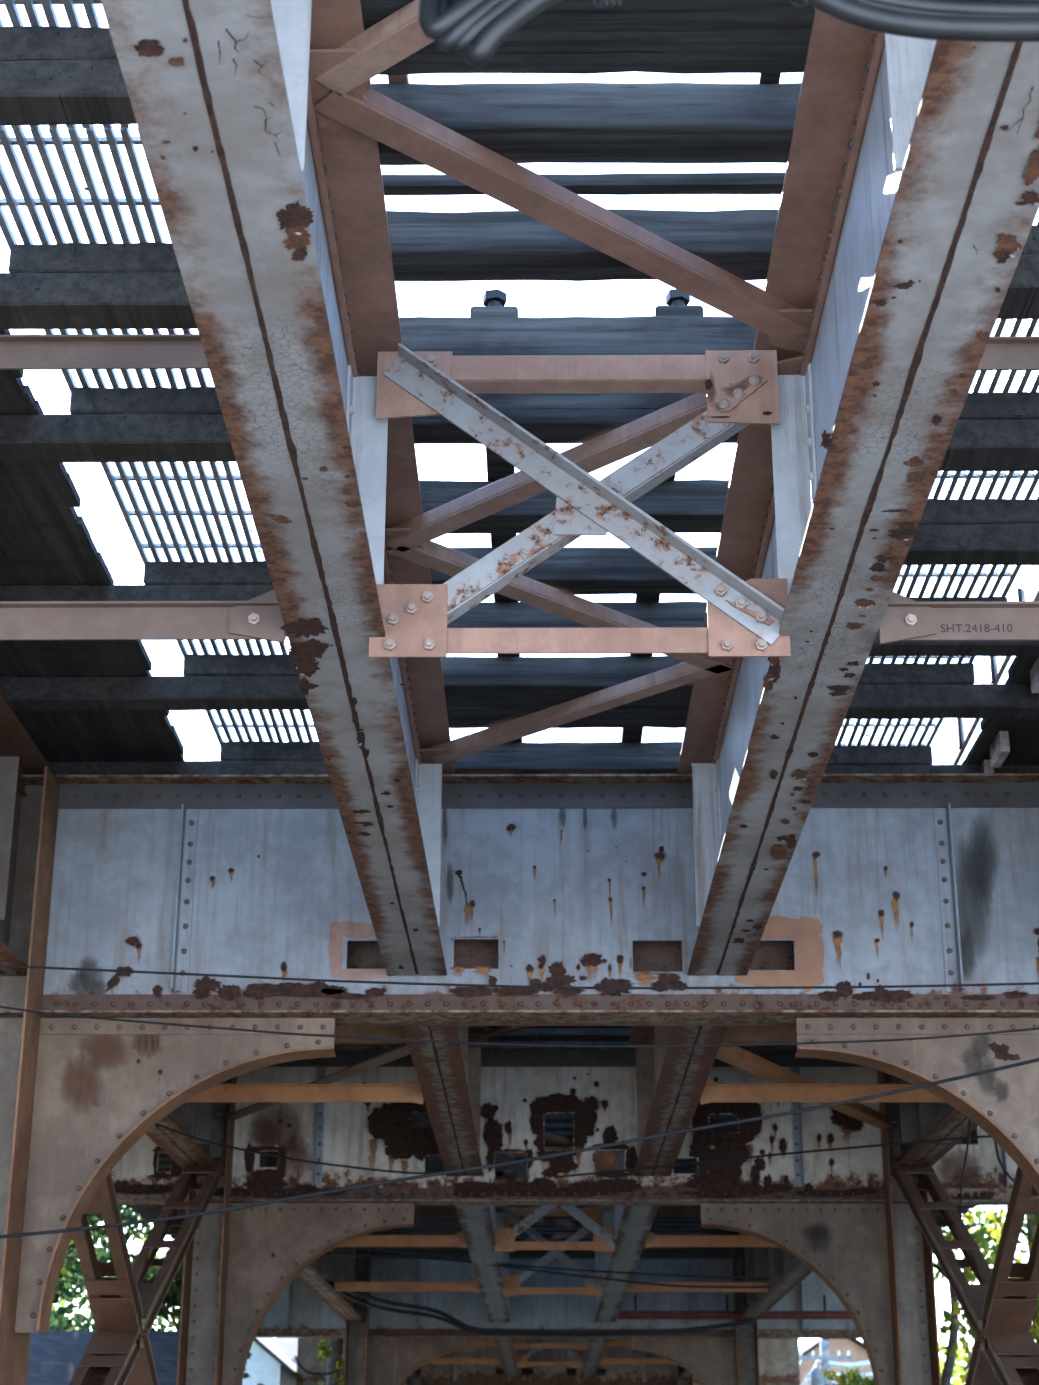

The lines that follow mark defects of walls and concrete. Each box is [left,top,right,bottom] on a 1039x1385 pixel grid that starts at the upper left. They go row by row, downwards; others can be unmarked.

rust [708,378,760,409]
rust [641,846,665,901]
rust [812,852,820,888]
rust [125,936,142,959]
rust [452,900,546,980]
rust [833,930,843,960]
rust [874,892,914,953]
rust [603,955,670,977]
rust [570,1073,608,1110]